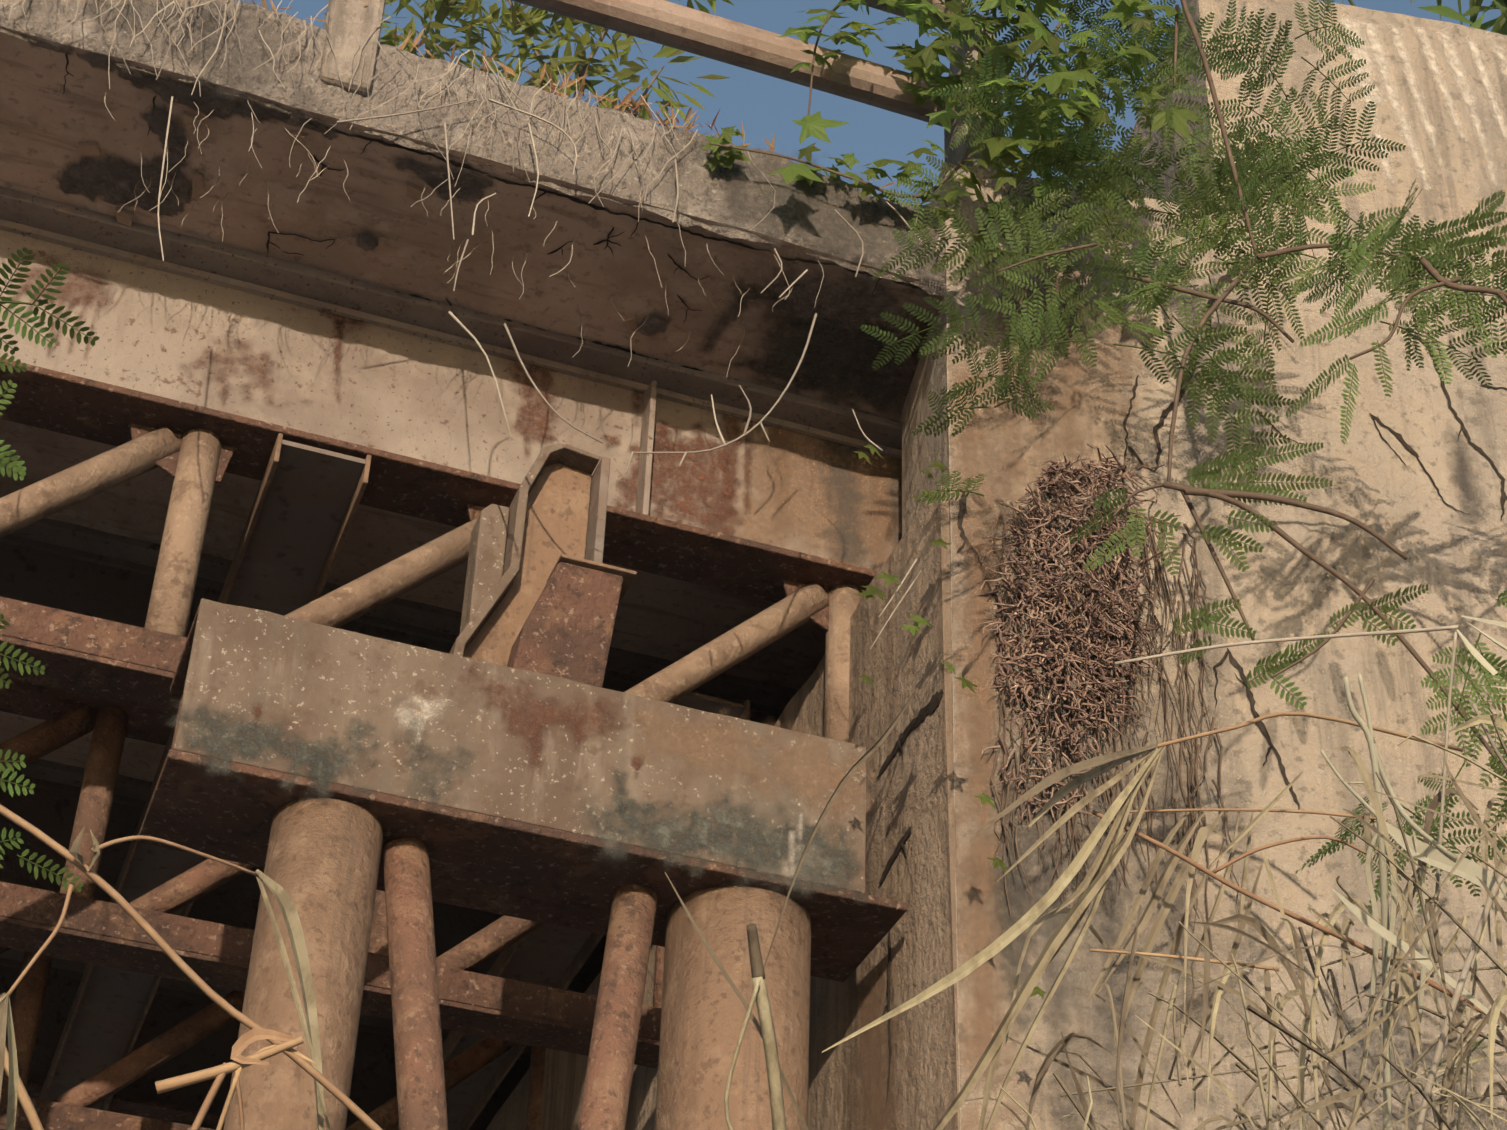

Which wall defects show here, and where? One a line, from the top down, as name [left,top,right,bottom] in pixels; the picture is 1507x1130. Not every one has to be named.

crack [266,231,335,256]
crack [307,122,923,325]
crack [504,319,738,380]
rust [604,415,752,535]
water stain [696,144,939,414]
crack [959,187,1096,281]
crack [1123,250,1250,472]
crack [1369,333,1507,520]
crack [877,477,1023,778]
crack [879,826,912,884]